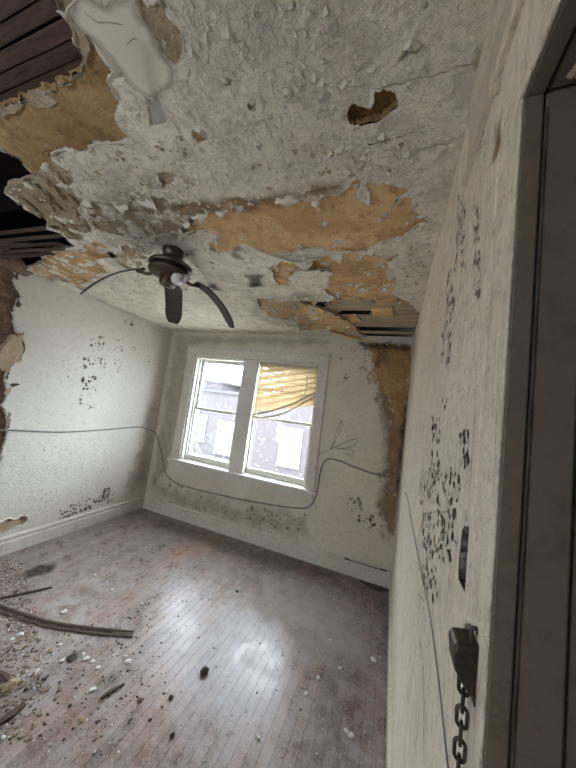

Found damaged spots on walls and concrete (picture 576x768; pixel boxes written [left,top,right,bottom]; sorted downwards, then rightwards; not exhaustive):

spalling [0,0,449,440]
water stain [360,342,411,365]
water stain [378,394,407,533]
spalling [0,489,113,533]
mould [345,496,376,529]